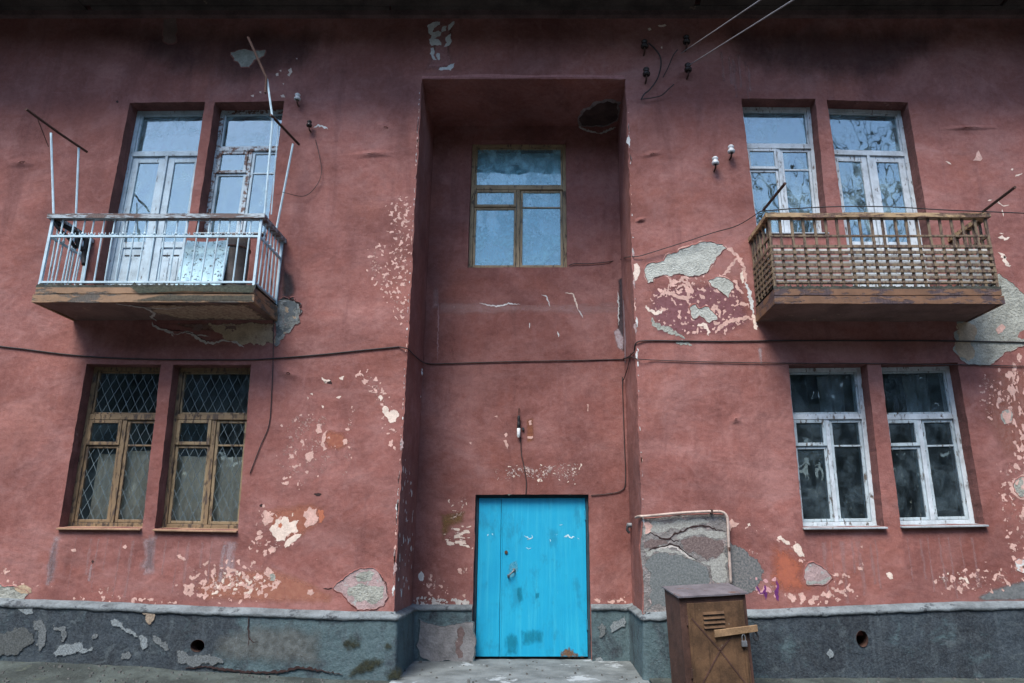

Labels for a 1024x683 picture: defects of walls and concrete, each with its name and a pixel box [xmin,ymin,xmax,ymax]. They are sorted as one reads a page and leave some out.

spalling [422,21,625,78]
spalling [578,99,632,164]
crack [118,304,243,347]
spalling [257,296,303,347]
peeling [366,188,415,384]
peeling [632,237,758,346]
spalling [934,252,1024,594]
peeling [98,369,477,667]
crack [647,525,723,560]
spalling [639,513,865,614]
spalling [0,566,98,657]